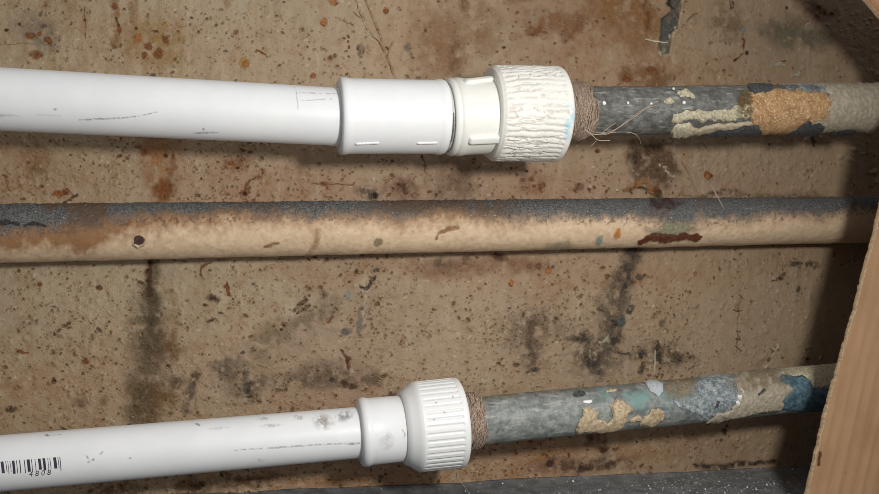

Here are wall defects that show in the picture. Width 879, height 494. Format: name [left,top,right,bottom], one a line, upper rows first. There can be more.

corrosion [110,0,121,48]
corrosion [134,22,181,59]
spalling [645,0,683,55]
leakage [570,247,682,374]
leakage [132,259,199,423]
leakage [513,316,557,372]